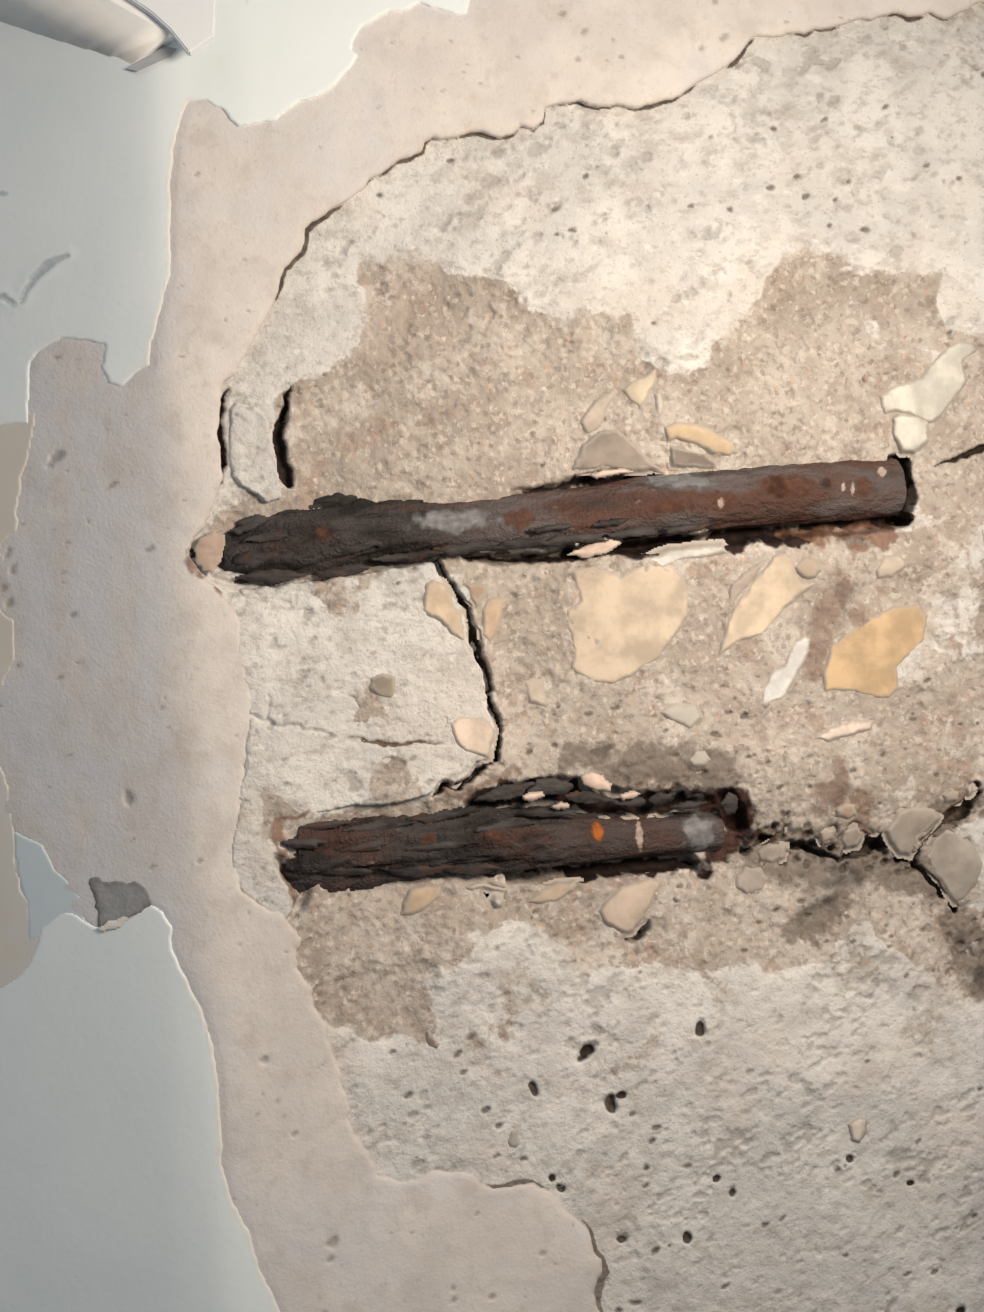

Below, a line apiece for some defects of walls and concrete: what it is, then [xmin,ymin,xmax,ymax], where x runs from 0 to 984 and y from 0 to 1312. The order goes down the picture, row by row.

crack [217,389,229,471]
crack [273,387,293,488]
rust [463,547,579,563]
spalling [190,458,908,586]
rust [523,469,651,494]
rust [607,455,915,560]
spalling [892,413,929,458]
spalling [878,341,977,423]
crack [432,561,500,797]
spalling [281,798,727,894]
rust [465,777,776,883]
crack [739,791,980,913]